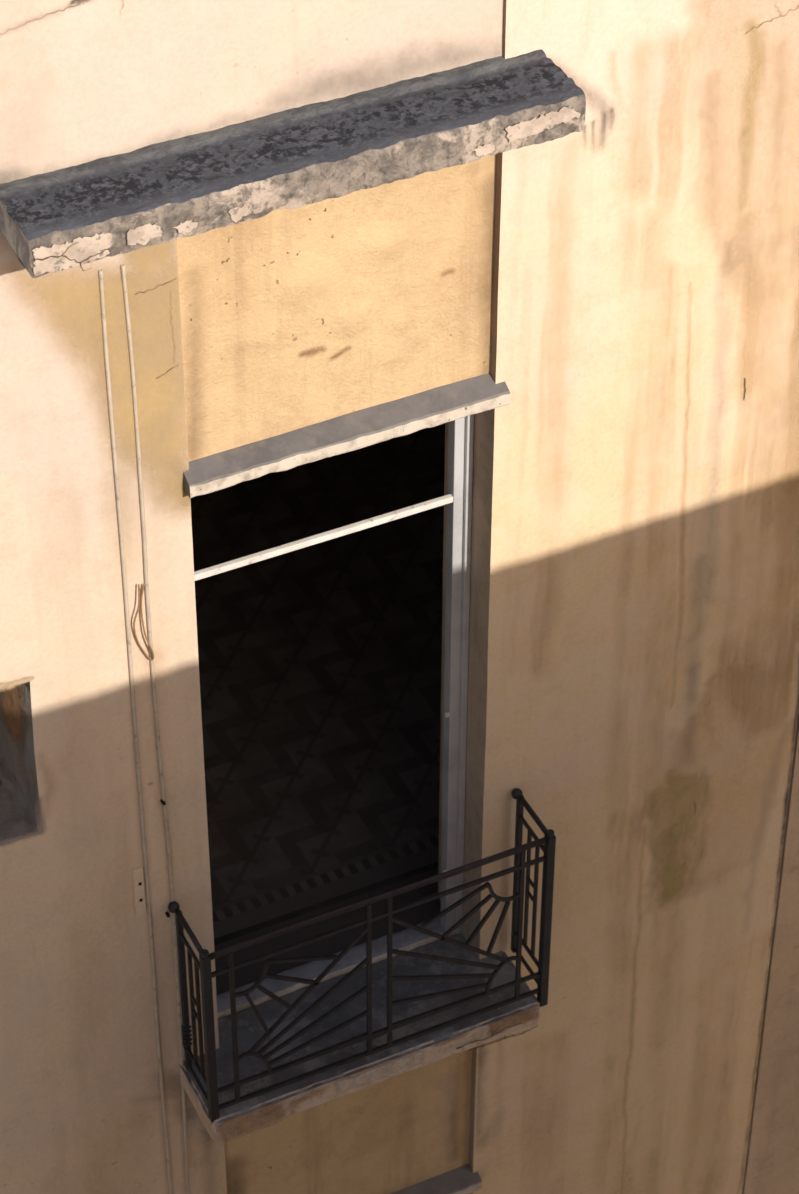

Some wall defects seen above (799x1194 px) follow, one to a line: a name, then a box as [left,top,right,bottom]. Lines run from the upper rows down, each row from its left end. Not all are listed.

crack [1,0,88,35]
peeling [228,204,251,223]
peeling [127,220,198,246]
peeling [32,232,112,276]
water stain [775,698,799,902]